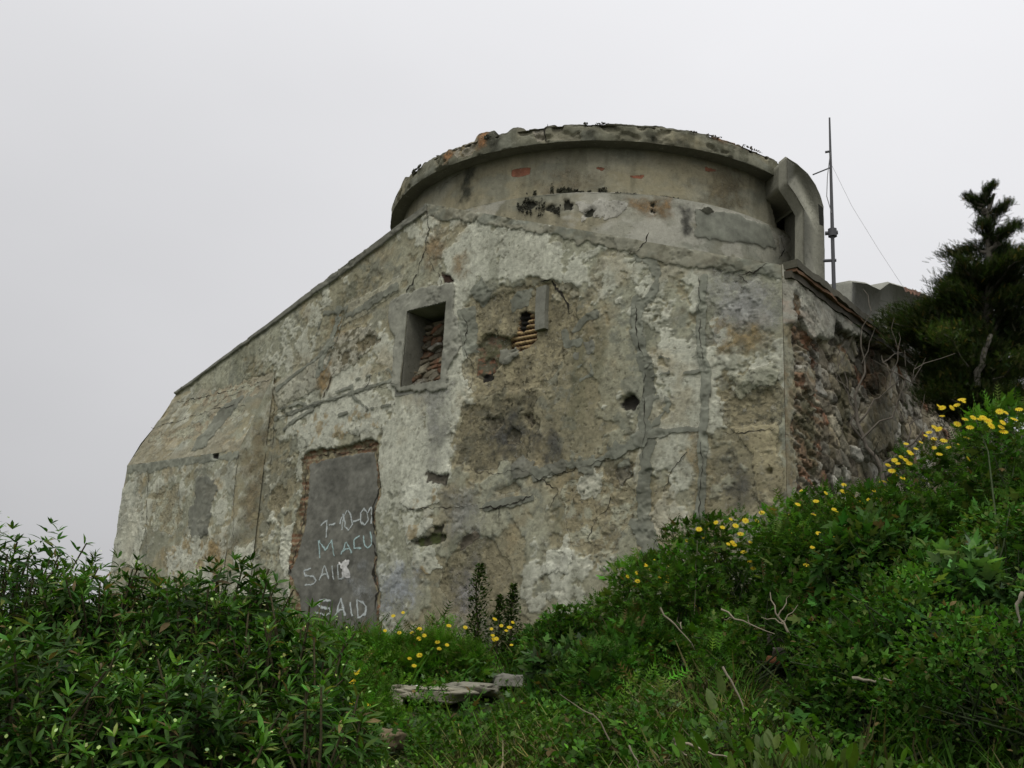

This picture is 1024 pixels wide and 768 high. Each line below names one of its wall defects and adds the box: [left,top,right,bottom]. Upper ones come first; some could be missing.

crack [406,205,442,292]
spalling [793,294,801,315]
crack [635,306,646,456]
peeling [400,279,579,618]
crack [663,442,703,515]